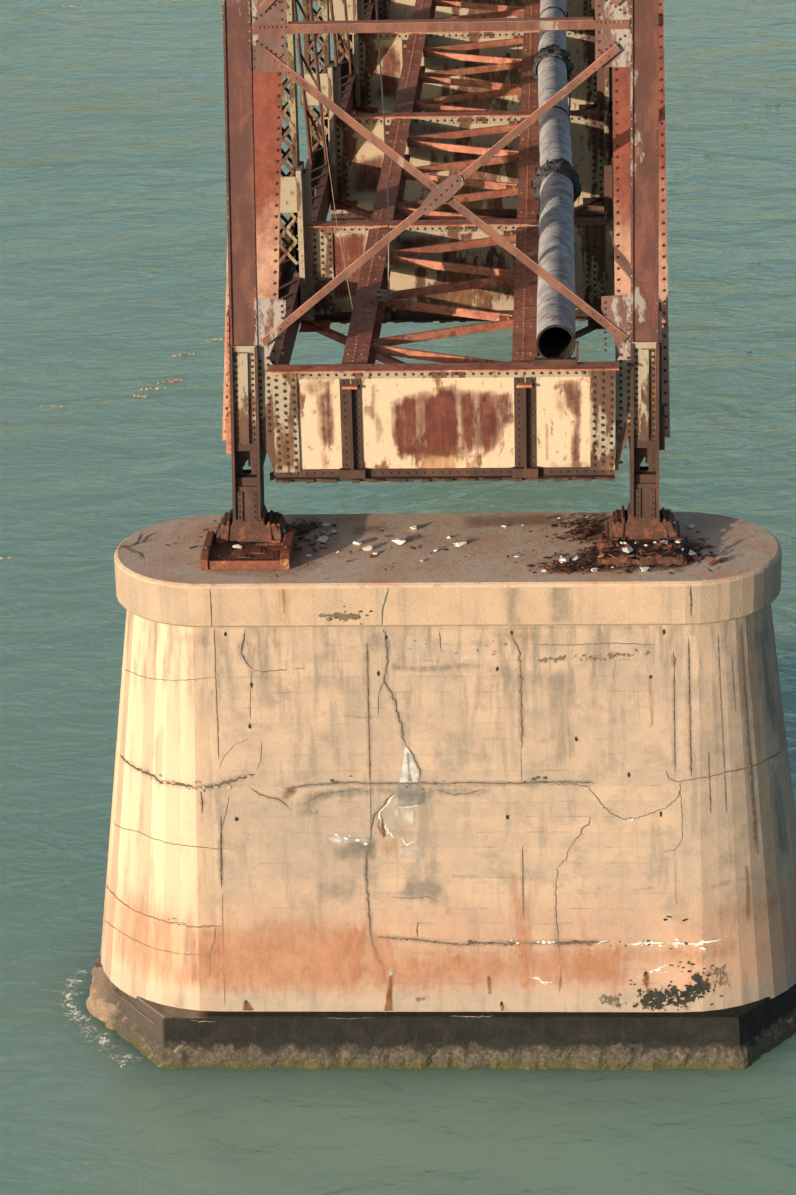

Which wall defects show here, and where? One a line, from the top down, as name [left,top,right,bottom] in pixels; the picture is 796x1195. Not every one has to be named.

rust [378,48,400,96]
rust [358,158,382,190]
rust [333,233,364,298]
rust [403,236,443,249]
rust [320,384,333,445]
rust [395,389,511,456]
rust [552,513,698,572]
crack [378,588,406,745]
spalling [378,745,425,838]
crack [105,624,781,999]
rust [384,970,393,1011]
water stain [602,961,723,1011]